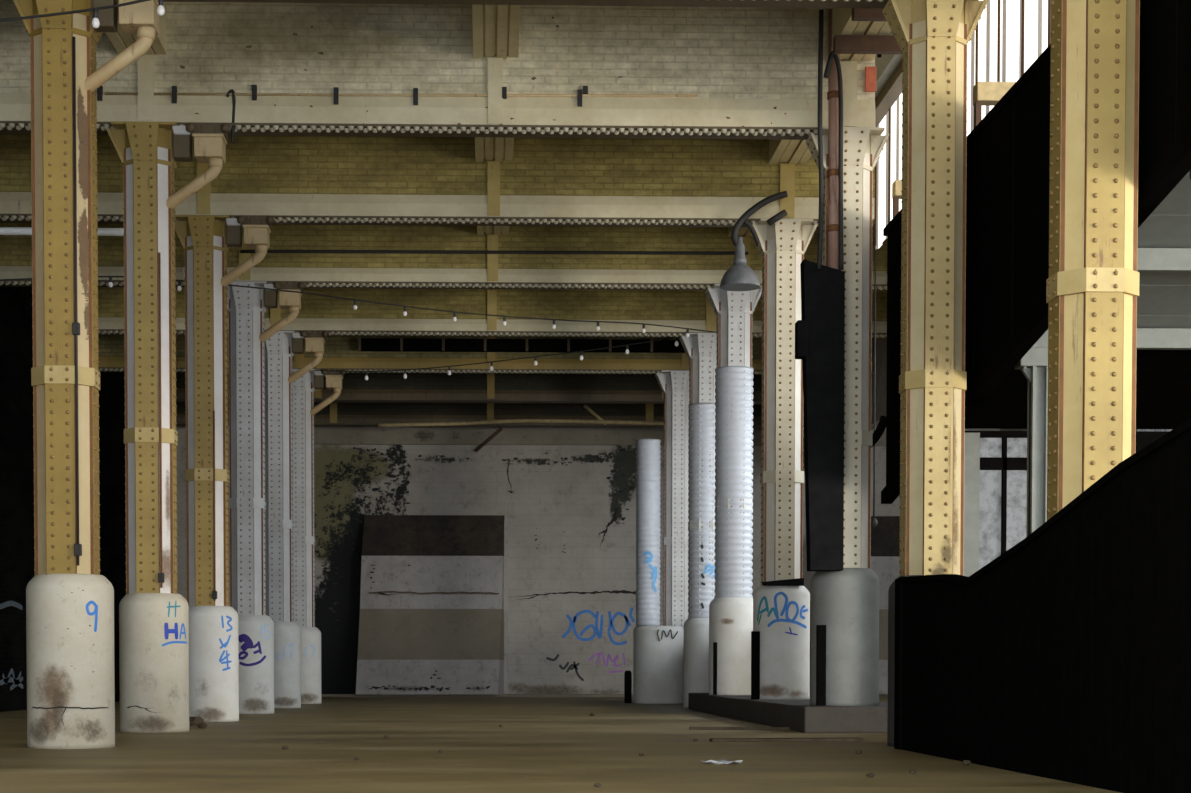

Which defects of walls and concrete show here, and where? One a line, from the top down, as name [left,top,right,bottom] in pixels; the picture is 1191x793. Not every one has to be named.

damp [314,445,410,577]